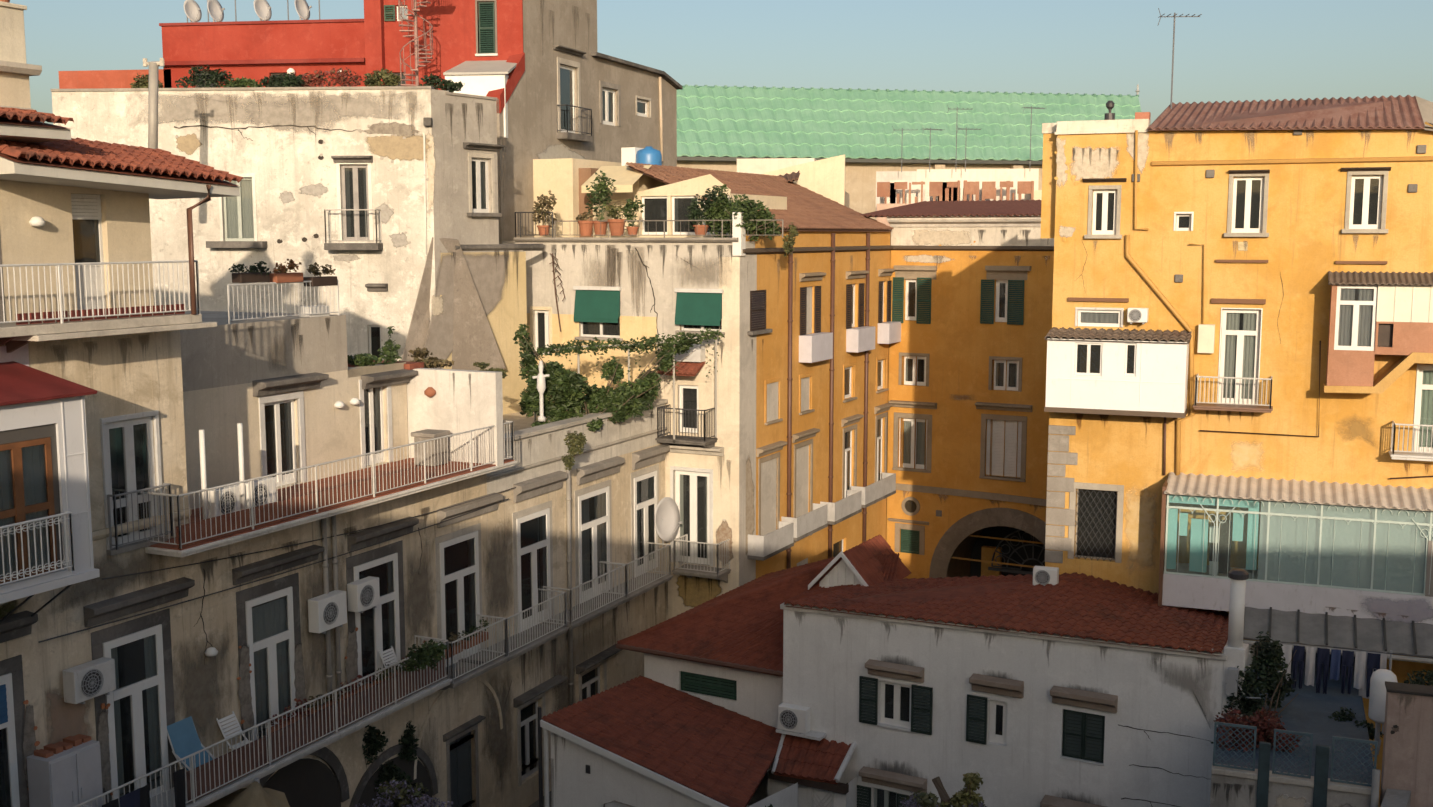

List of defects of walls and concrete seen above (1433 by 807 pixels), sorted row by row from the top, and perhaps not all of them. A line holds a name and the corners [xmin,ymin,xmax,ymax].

damp [158,94,402,133]
spalling [358,121,435,214]
peeling [1054,132,1151,186]
damp [495,250,518,283]
damp [542,245,732,287]
damp [291,319,303,351]
damp [1329,598,1433,624]